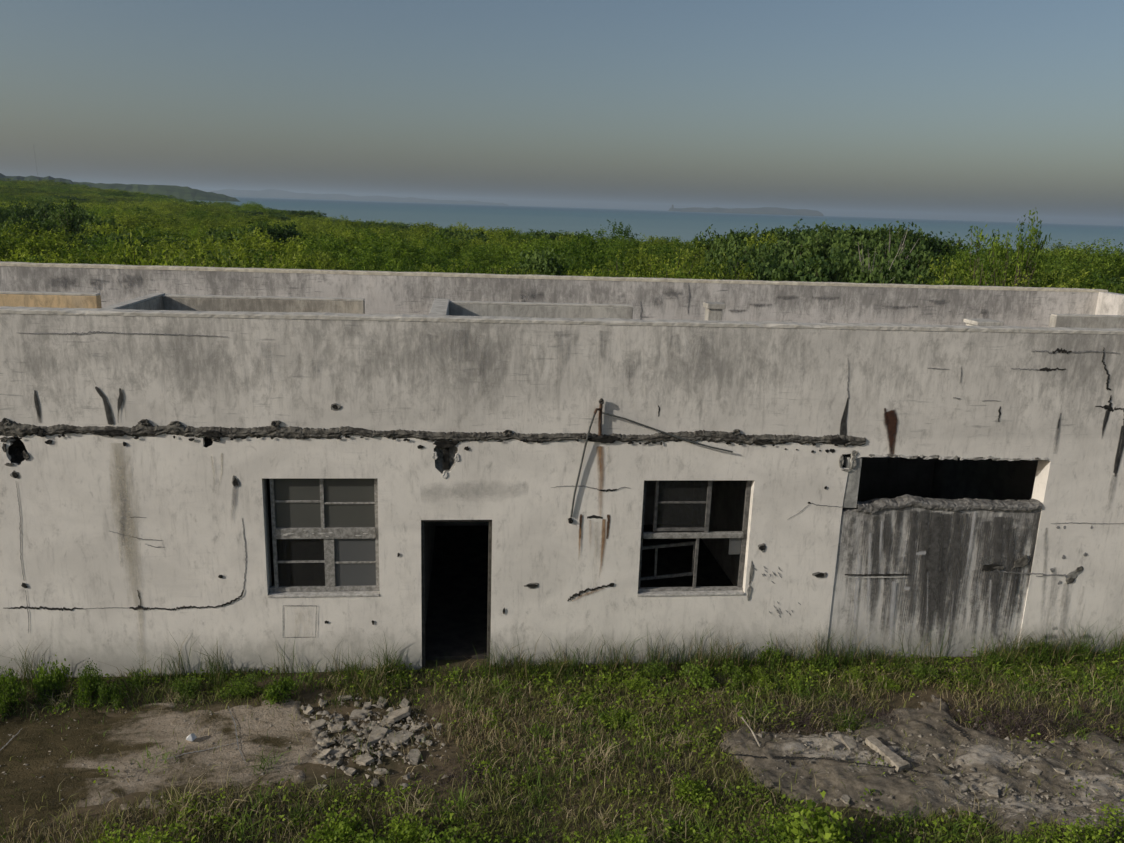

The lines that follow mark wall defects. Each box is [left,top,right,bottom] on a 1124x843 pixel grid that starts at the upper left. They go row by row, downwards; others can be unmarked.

spalling [0,418,1048,479]
corrosion [884,408,897,456]
crack [1011,347,1123,435]
crack [3,484,247,633]
corrosion [579,514,610,564]
damp [846,510,1047,655]